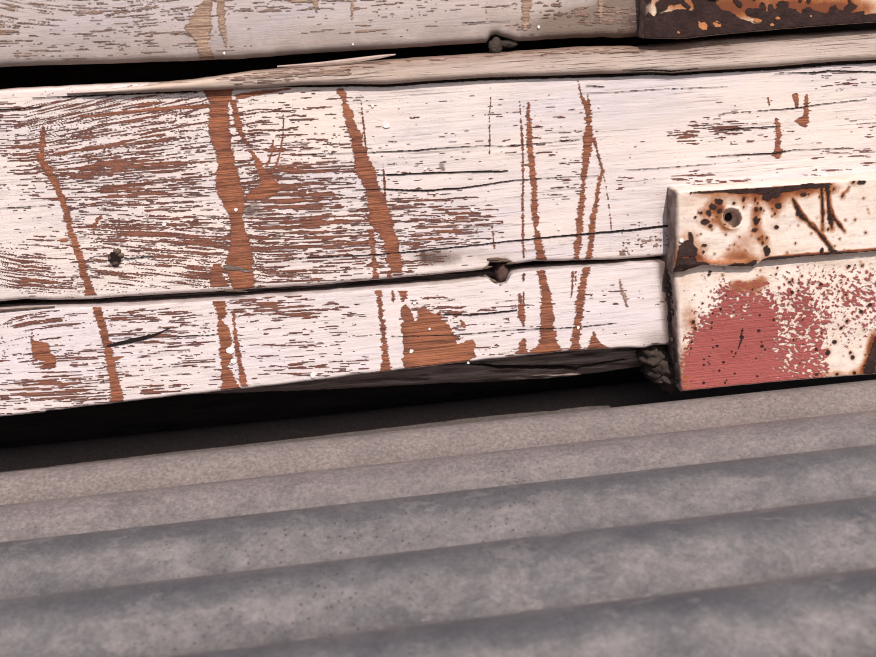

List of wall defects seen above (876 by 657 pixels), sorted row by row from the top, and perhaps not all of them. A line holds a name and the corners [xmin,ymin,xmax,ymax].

peeling [471,0,640,37]
rust [644,0,876,38]
peeling [668,67,876,176]
peeling [671,171,751,185]
peeling [0,62,668,414]
rust [673,180,876,296]
crack [106,328,216,347]
crack [399,310,613,337]
crack [471,358,625,370]
rust [703,306,746,384]
peeling [679,263,876,390]
rust [847,329,876,375]